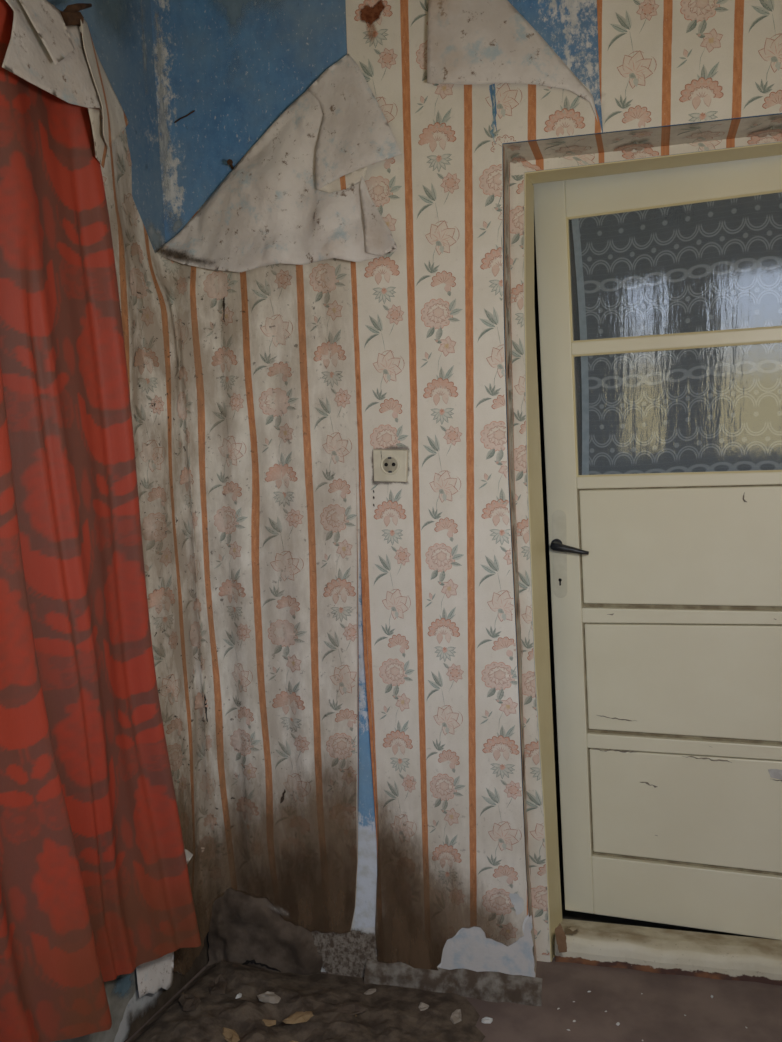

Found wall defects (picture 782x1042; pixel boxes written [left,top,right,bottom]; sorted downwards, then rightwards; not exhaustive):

corrosion [360,0,385,37]
leakage [125,768,511,1042]
flaking render [364,893,543,1006]